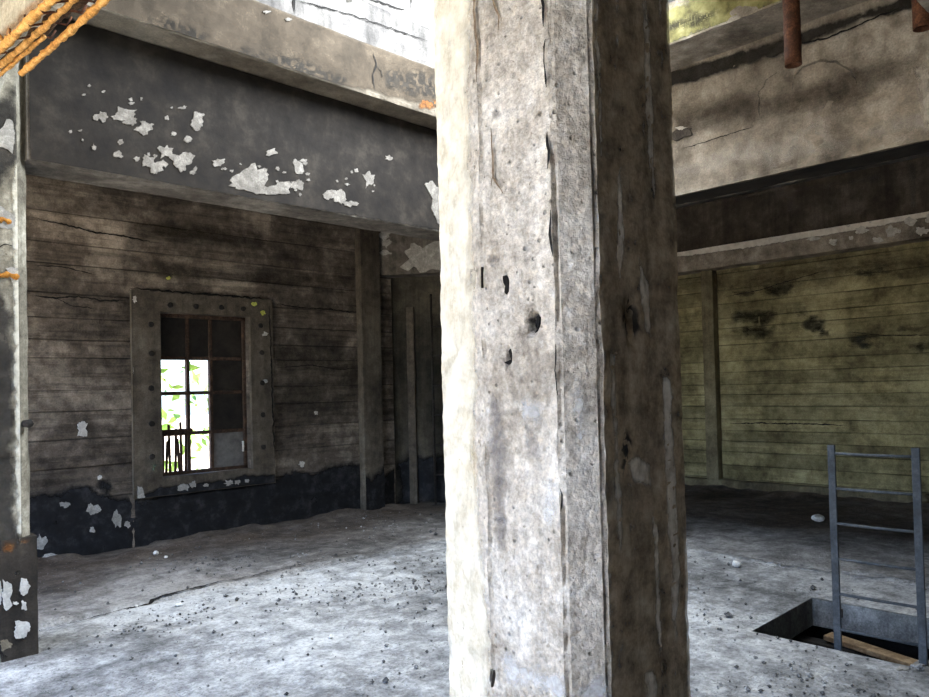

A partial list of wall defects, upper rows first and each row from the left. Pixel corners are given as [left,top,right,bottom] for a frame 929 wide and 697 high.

rust [1,0,43,37]
peeling [93,97,154,136]
spalling [0,119,15,154]
peeling [113,105,205,175]
peeling [212,158,310,196]
peeling [400,241,441,273]
leakage [0,86,360,557]
leakage [584,0,929,697]
peeling [86,503,101,515]
peeling [112,509,131,528]
peeling [37,534,57,558]
peeling [0,578,31,651]